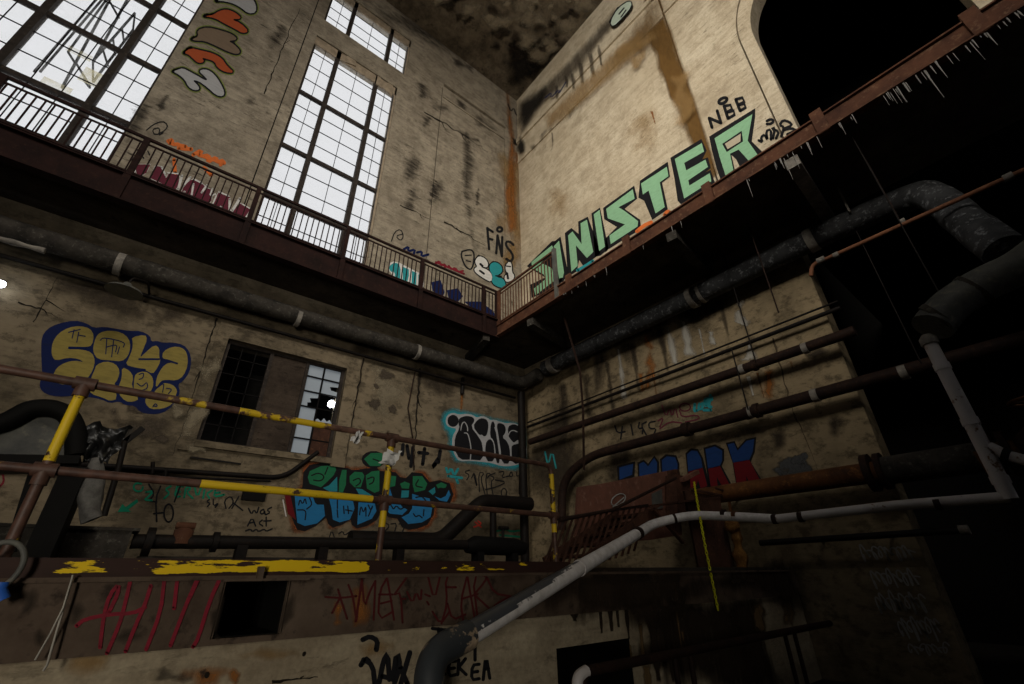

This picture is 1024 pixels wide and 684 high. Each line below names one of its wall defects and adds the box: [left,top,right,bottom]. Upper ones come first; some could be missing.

rust [506,94,518,231]
leakage [538,0,716,177]